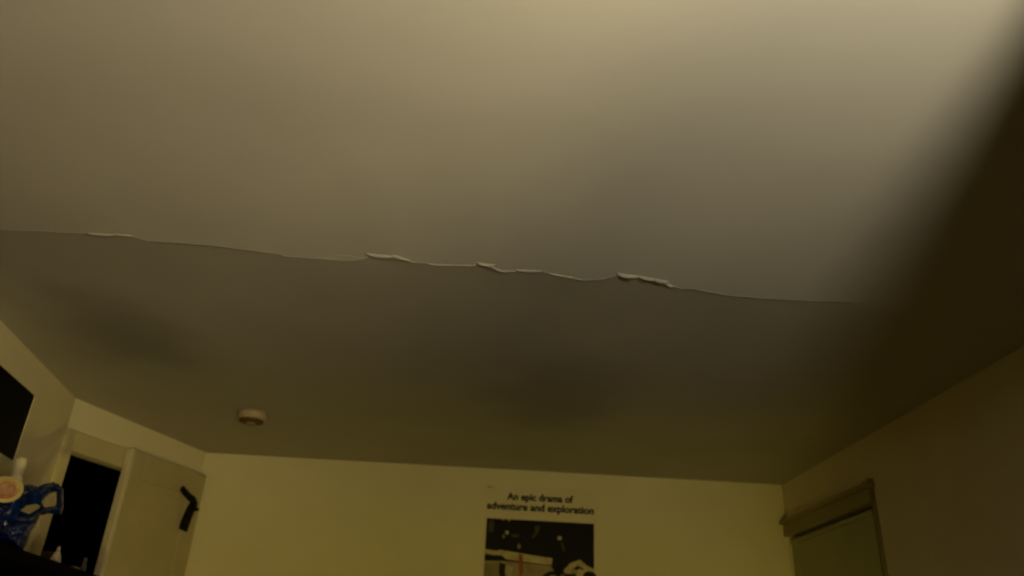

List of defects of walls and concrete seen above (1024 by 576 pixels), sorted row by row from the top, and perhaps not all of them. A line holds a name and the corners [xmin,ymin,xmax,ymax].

crack [0,229,855,303]